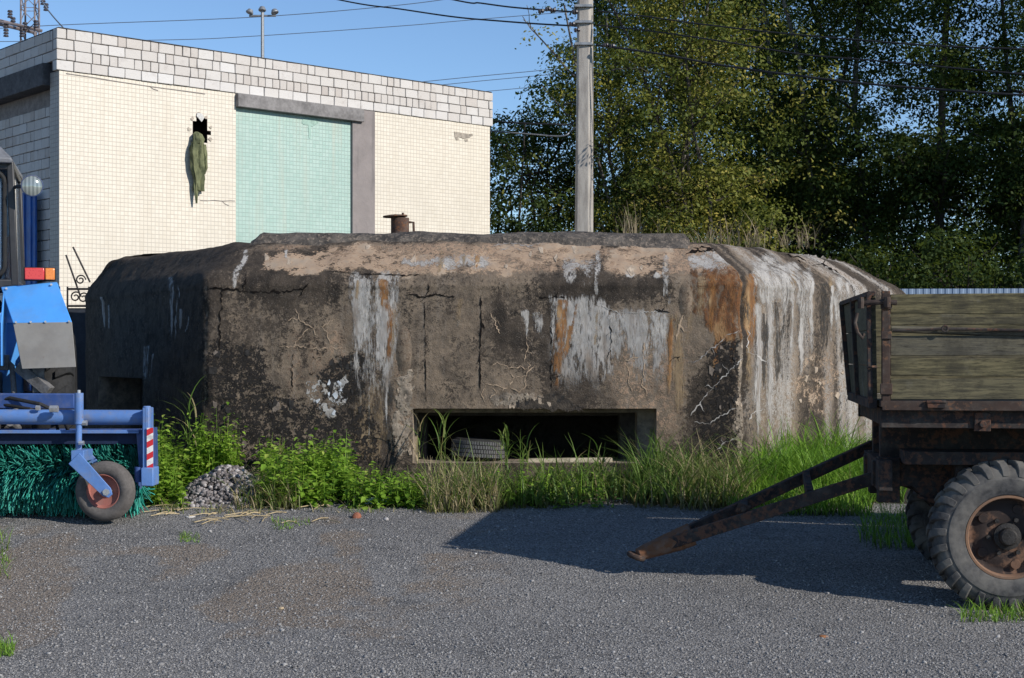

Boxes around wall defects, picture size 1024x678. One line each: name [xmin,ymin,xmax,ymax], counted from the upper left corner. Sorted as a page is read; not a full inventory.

spalling [188,112,212,148]
peeling [205,338,415,476]
water stain [349,271,399,458]
corrosion [378,279,395,360]
crack [337,271,455,401]
crack [478,298,558,402]
corrosion [554,299,576,385]
water stain [521,253,669,381]
crack [602,305,766,449]
corrosion [667,266,758,411]
water stain [753,260,850,433]